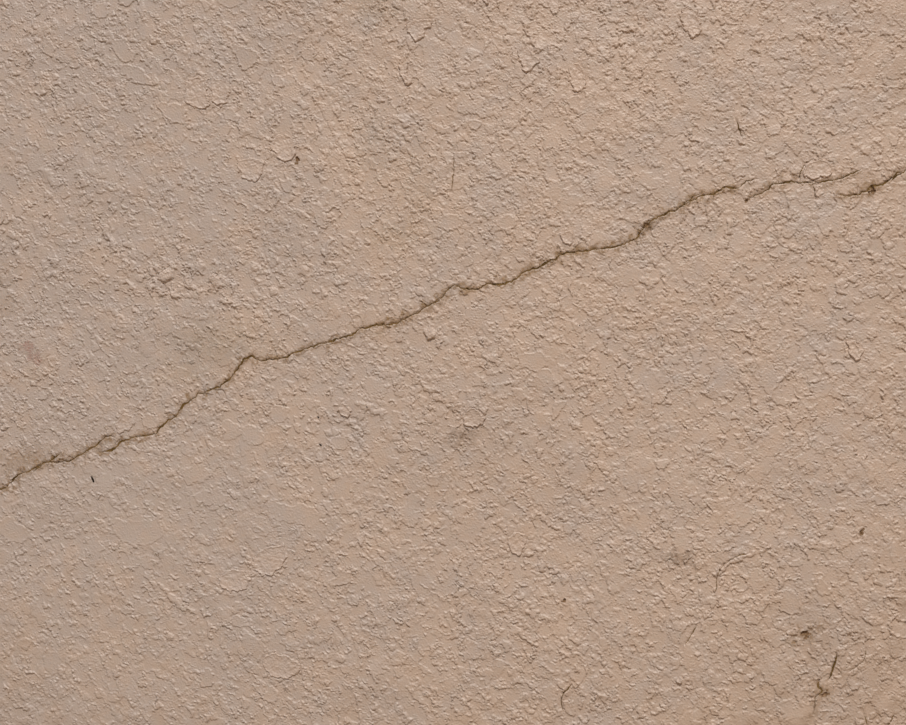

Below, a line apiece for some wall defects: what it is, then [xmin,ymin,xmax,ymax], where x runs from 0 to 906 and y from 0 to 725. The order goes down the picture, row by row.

crack [0,160,906,490]